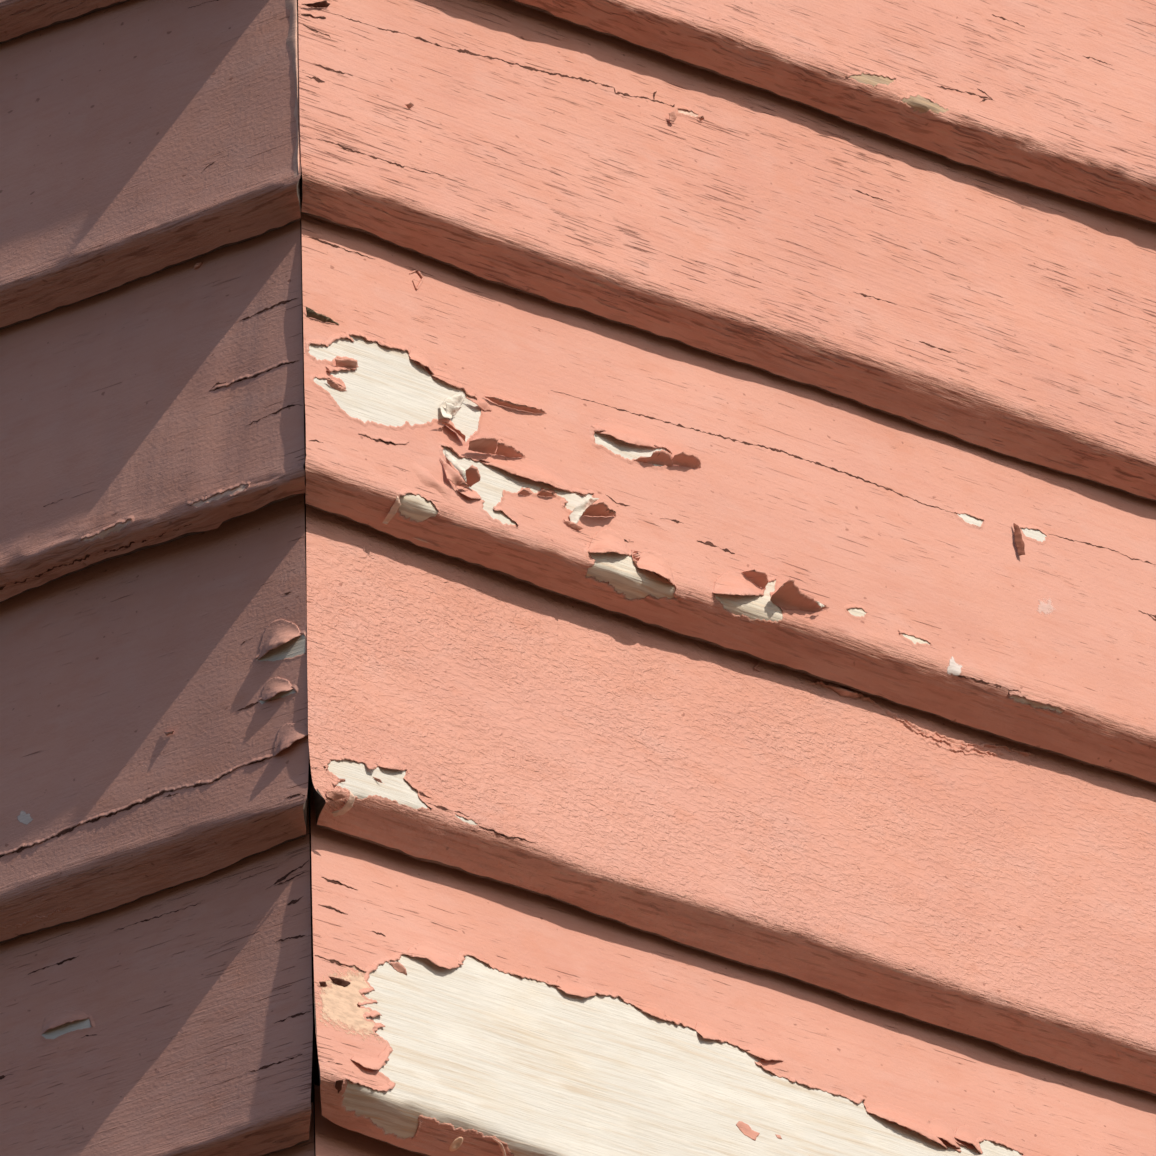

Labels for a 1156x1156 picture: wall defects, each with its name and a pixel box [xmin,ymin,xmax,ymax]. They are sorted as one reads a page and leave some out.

crack [300,10,675,107]
peeling [305,330,701,605]
peeling [711,569,830,626]
peeling [253,619,306,707]
crack [0,753,274,857]
peeling [323,752,433,817]
crack [114,903,199,931]
peeling [40,1010,95,1043]
peeling [336,941,1025,1156]